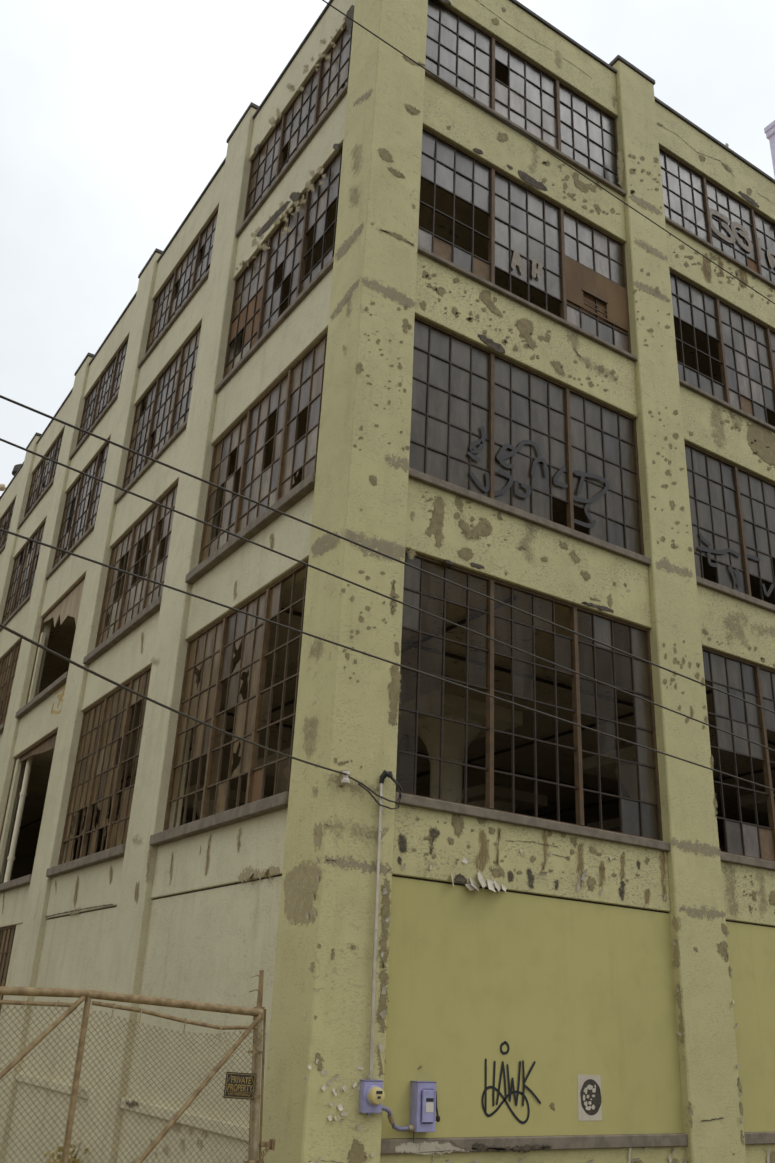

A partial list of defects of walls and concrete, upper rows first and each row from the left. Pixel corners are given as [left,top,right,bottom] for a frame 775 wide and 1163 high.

spalling [303,5,354,73]
spalling [236,165,326,270]
peeling [377,148,406,179]
peeling [507,161,620,215]
peeling [617,150,661,194]
peeling [355,265,618,409]
peeling [718,408,775,471]
peeling [422,491,503,569]
peeling [341,570,402,726]
peeling [412,814,650,895]
peeling [375,878,392,1077]
spalling [472,1143,551,1163]